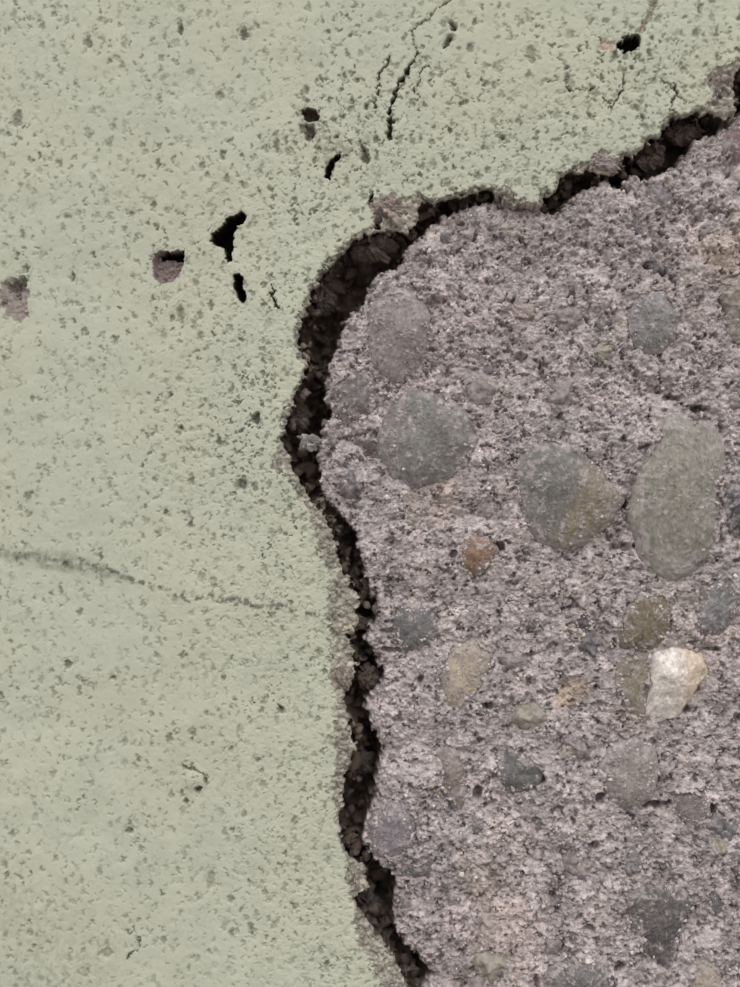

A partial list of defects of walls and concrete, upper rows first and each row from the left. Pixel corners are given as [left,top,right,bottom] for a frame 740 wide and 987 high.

crack [373,0,452,141]
hole [439,17,462,51]
peeling [523,40,540,67]
spalling [0,260,34,326]
peeling [248,408,265,429]
spalling [269,46,740,987]
crack [269,68,740,987]